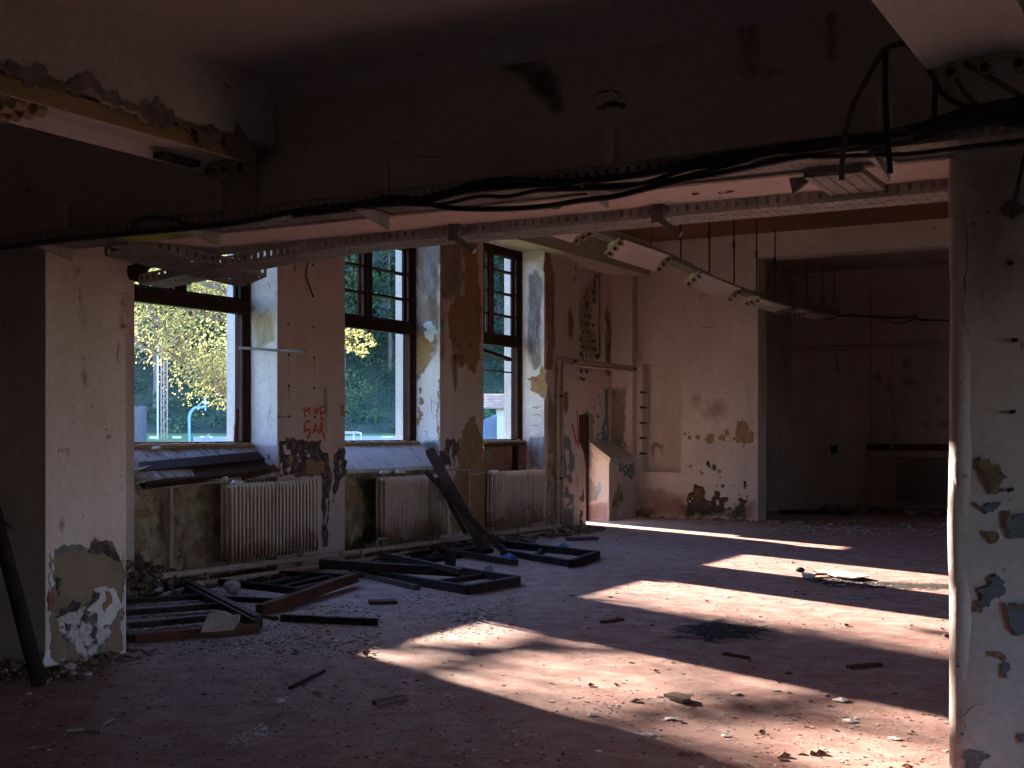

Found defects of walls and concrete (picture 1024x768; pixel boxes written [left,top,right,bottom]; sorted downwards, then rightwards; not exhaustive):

spalling [0,60,271,152]
damp [528,270,555,369]
spalling [416,242,527,536]
spalling [545,273,625,527]
spalling [683,419,754,448]
peeling [267,437,429,551]
spalling [609,462,635,521]
peeling [685,461,748,516]
spalling [976,456,1024,544]
spalling [42,479,265,669]
peeling [976,573,1024,636]
peeling [988,651,1011,679]